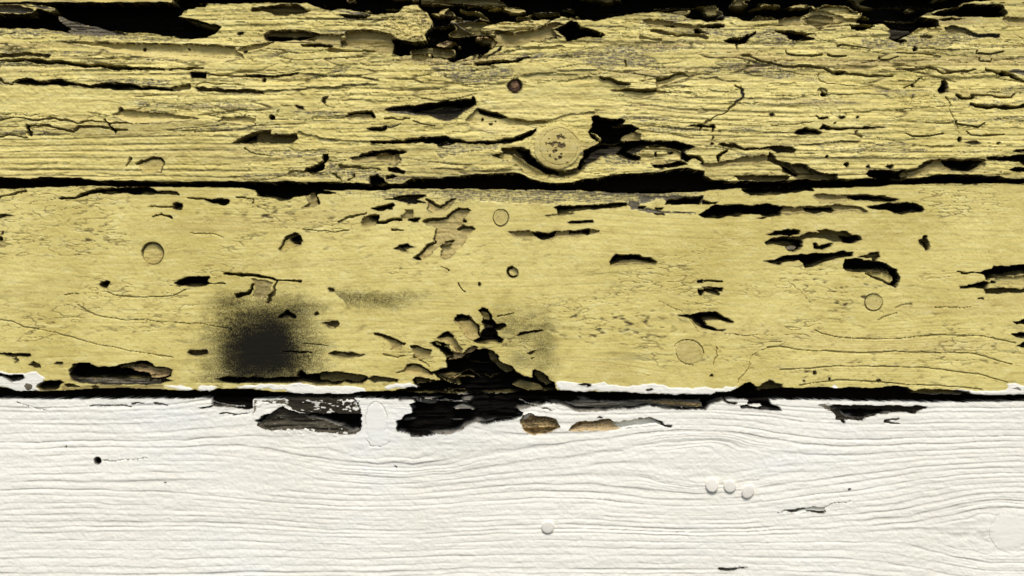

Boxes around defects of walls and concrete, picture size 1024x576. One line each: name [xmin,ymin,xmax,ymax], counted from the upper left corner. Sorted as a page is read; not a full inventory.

spalling [638,18,725,42]
spalling [63,36,316,63]
spalling [112,72,599,144]
peeling [520,59,894,115]
peeling [896,25,1024,172]
spalling [516,150,559,175]
spalling [652,151,797,185]
spalling [777,194,898,216]
spalling [373,314,481,377]
peeling [252,393,362,435]
spalling [568,417,673,432]
spalling [836,408,915,418]